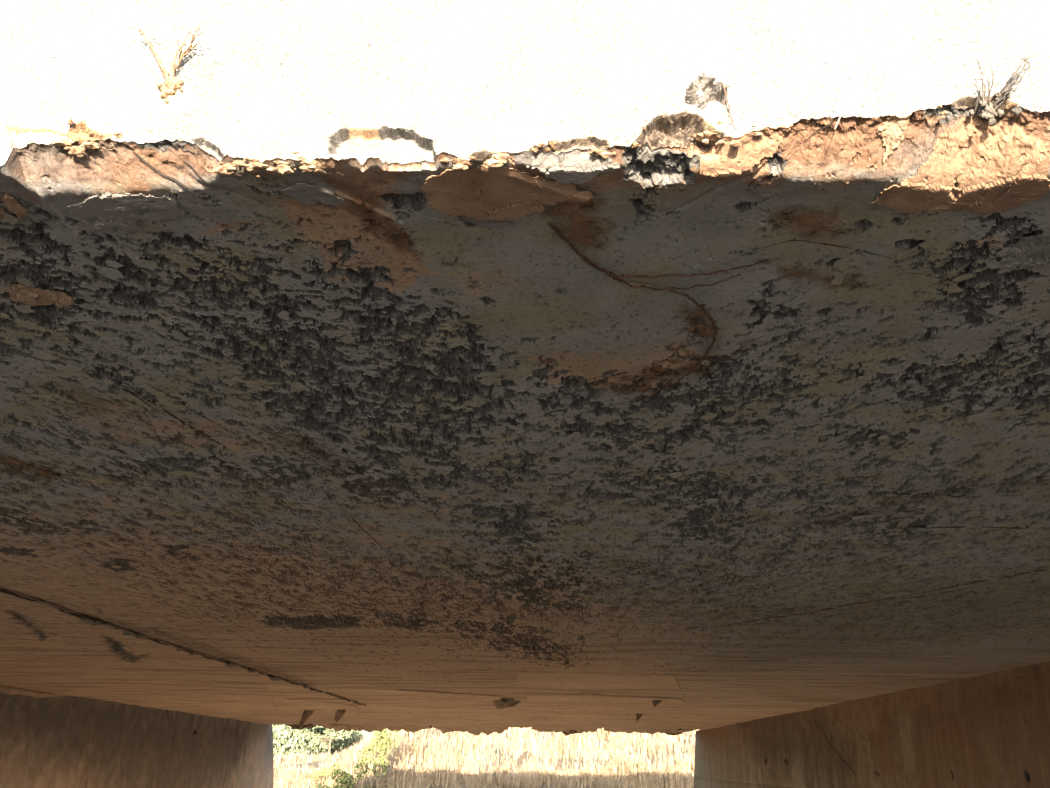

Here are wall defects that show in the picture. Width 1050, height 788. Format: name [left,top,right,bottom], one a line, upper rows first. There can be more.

spalling [923,94,1037,127]
spalling [5,119,509,178]
spalling [527,72,763,212]
spalling [766,151,788,176]
peeling [0,192,1050,665]